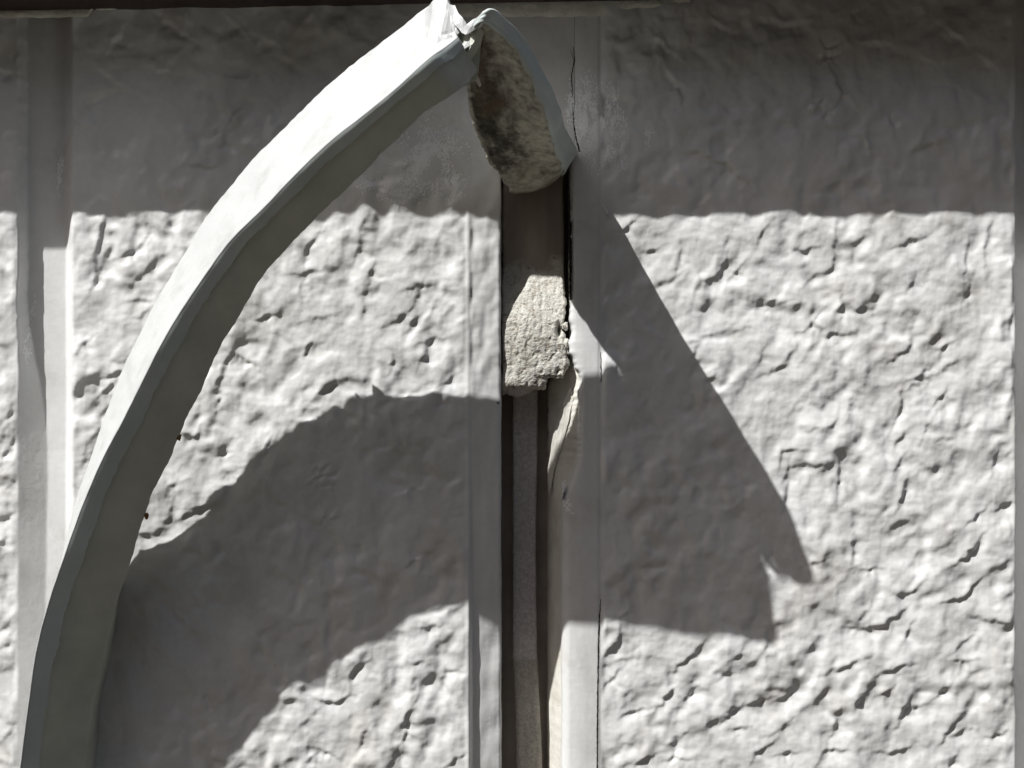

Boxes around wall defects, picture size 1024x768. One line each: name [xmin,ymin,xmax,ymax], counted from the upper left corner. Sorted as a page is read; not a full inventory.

peeling [19,0,578,768]
crack [567,47,581,300]